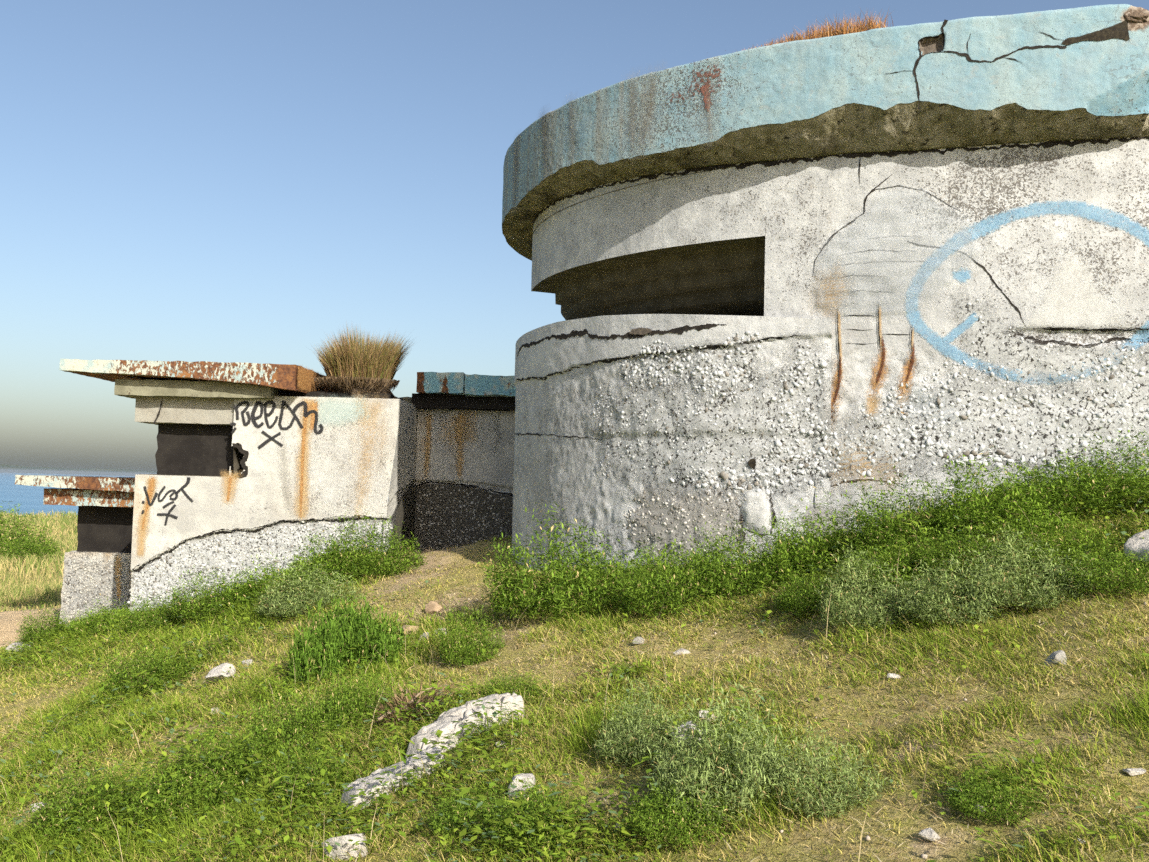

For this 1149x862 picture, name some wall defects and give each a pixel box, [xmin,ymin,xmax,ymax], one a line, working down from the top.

crack [886,20,1067,109]
spalling [1062,9,1149,45]
crack [532,137,1149,273]
crack [907,241,1149,348]
crack [517,323,801,381]
corrosion [831,308,843,426]
corrosion [868,305,888,418]
corrosion [899,324,915,414]
hole [232,443,249,478]
corrosion [296,365,325,518]
corrosion [138,477,156,555]
spalling [61,519,393,620]